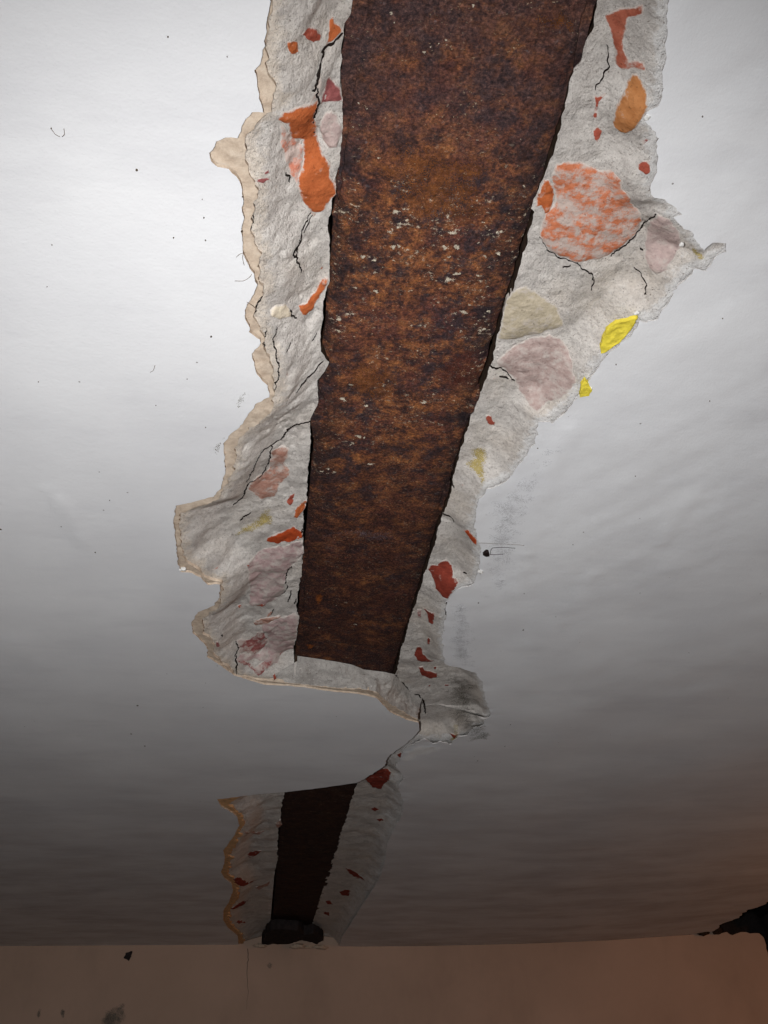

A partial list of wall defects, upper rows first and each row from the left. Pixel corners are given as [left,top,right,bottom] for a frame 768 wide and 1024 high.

crack [312,33,343,133]
crack [595,45,610,90]
crack [293,212,313,272]
crack [539,236,595,291]
crack [611,213,656,295]
crack [233,420,311,521]
flaking render [174,0,726,950]
flaking render [688,902,768,952]